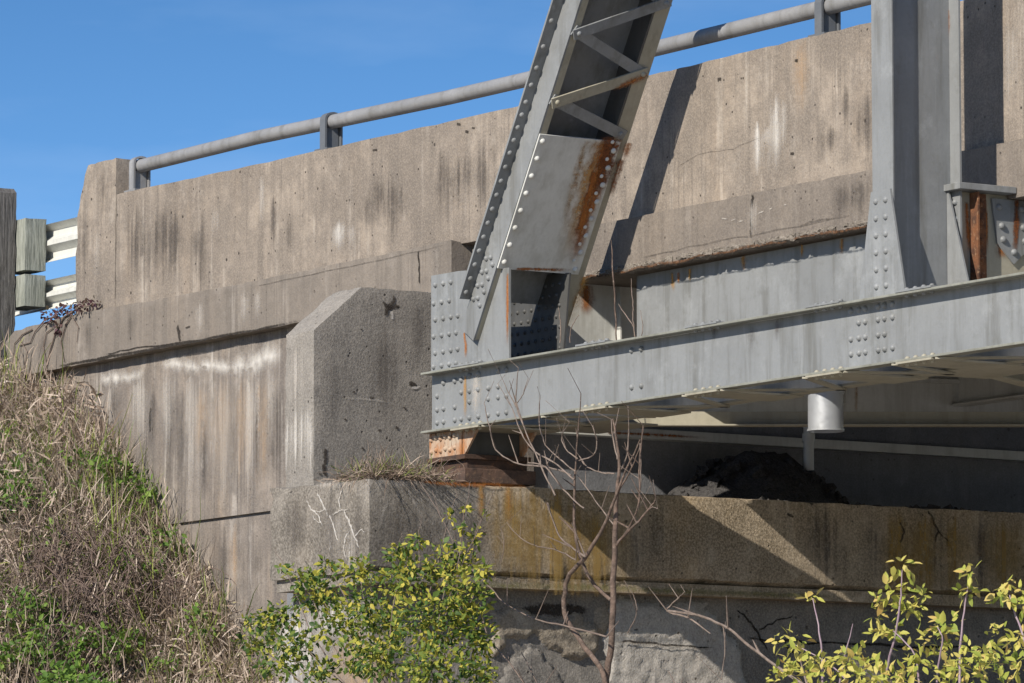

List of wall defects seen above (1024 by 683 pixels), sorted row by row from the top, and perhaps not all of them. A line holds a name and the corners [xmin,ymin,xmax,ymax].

rust [569,137,632,241]
leakage [168,349,275,462]
leakage [497,492,606,590]
flaking render [488,595,747,683]
crack [738,610,1006,674]